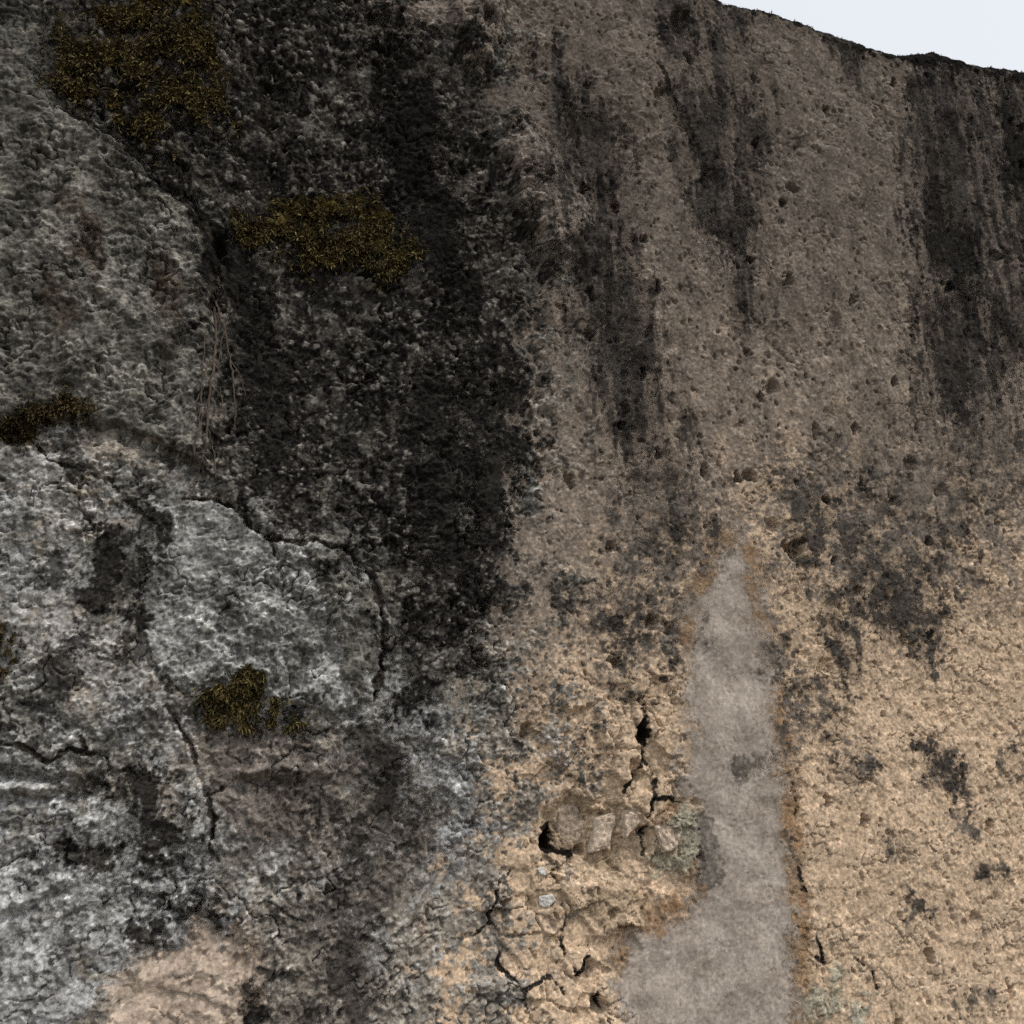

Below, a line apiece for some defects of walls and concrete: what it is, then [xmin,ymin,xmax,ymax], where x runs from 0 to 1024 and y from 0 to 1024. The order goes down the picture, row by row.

damp [651,0,1024,784]
crack [28,441,158,524]
damp [29,0,734,1024]
crack [184,497,386,701]
crack [0,734,109,765]
crack [176,720,224,862]
spalling [525,790,726,933]
spalling [635,714,652,748]
crack [622,692,681,855]
crack [472,870,611,1024]